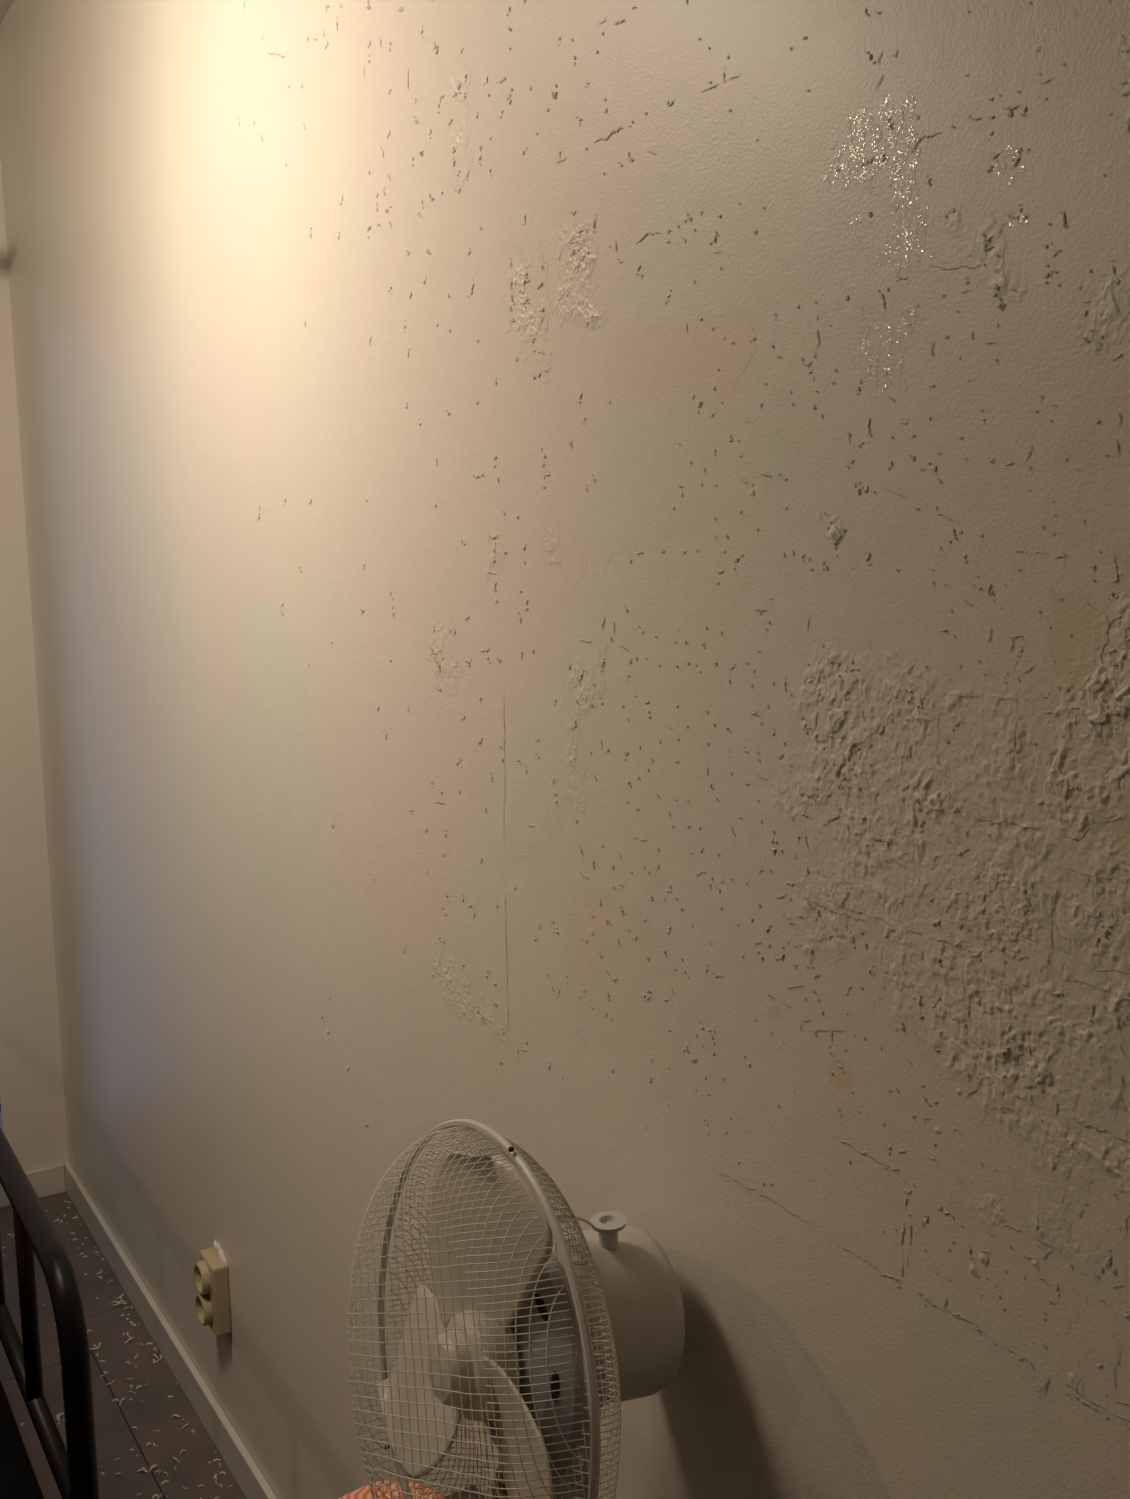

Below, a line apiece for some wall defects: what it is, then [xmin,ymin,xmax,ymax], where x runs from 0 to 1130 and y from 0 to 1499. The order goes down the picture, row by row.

peeling [411,75,531,166]
crack [723,1173,1130,1429]